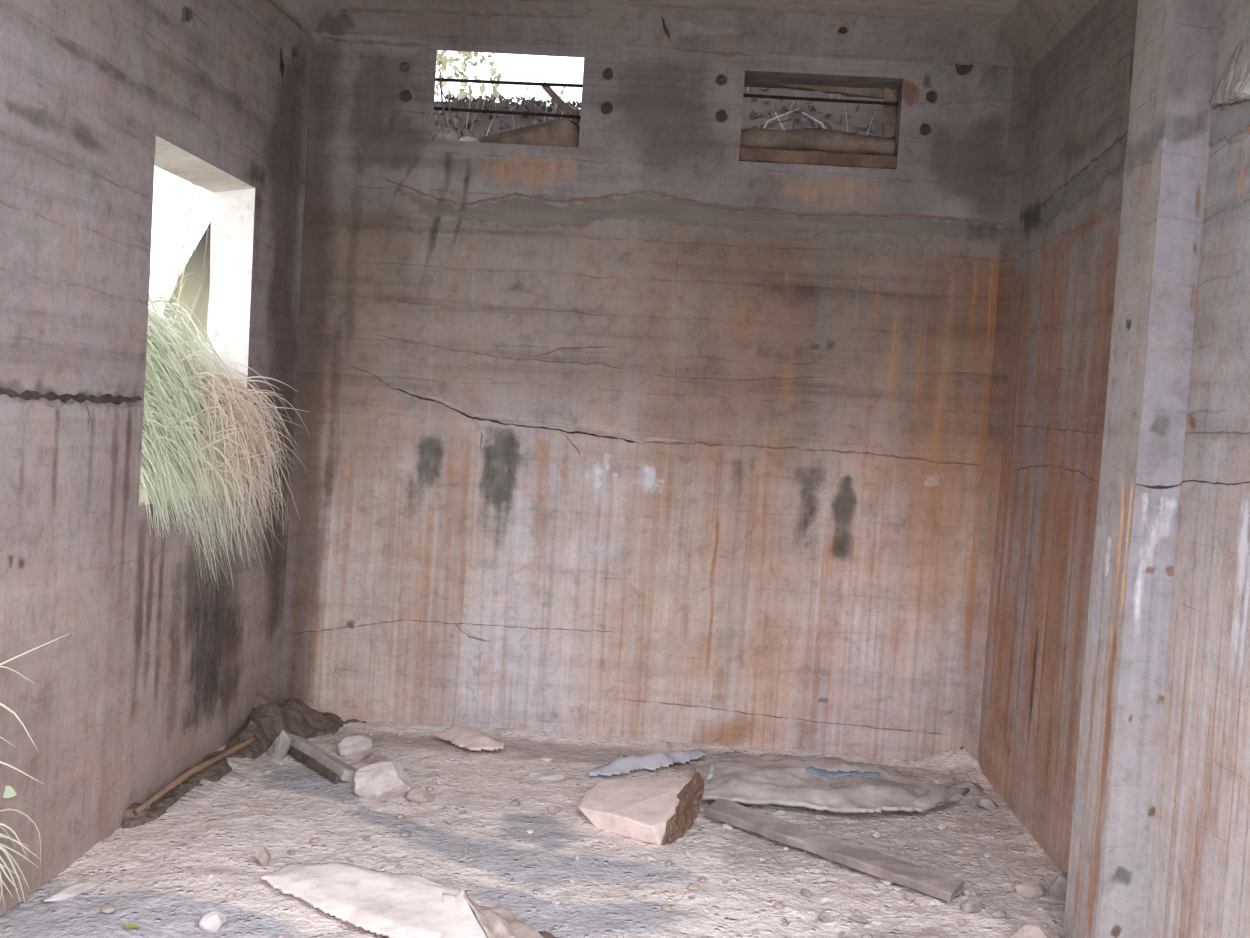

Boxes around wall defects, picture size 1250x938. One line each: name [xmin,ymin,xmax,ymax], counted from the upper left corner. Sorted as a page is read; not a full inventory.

crack [0,387,142,405]
crack [391,388,688,445]
crack [1136,480,1250,489]
damp [833,477,855,553]